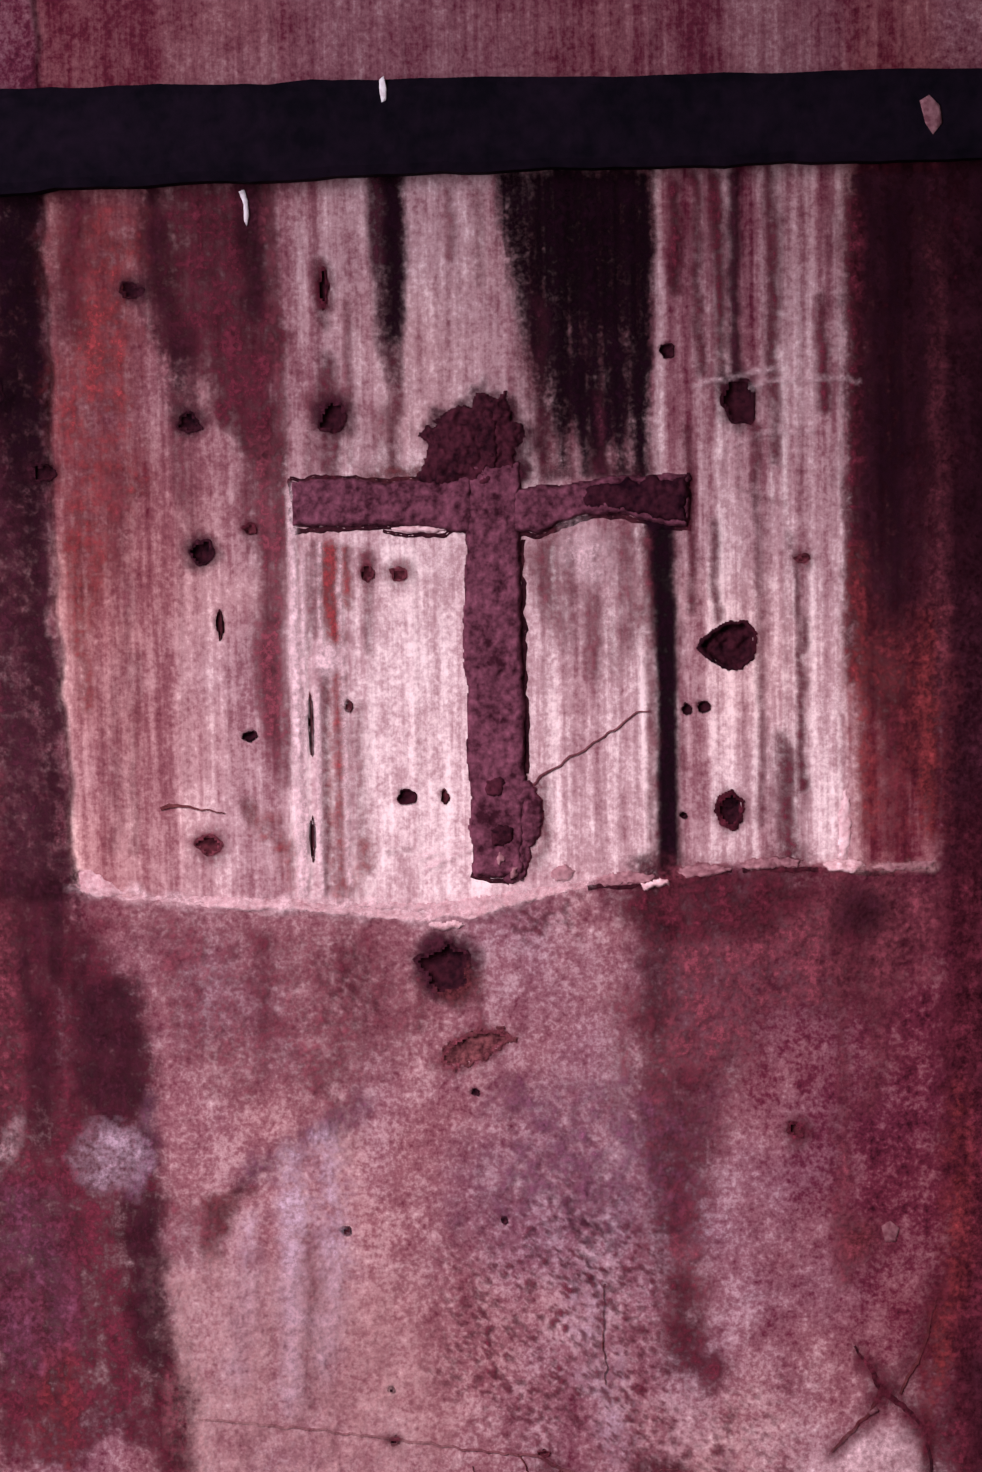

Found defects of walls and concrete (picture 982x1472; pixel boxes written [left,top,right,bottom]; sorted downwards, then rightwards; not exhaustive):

water stain [366,177,418,479]
water stain [424,170,740,481]
corrosion [308,542,369,645]
corrosion [532,535,569,624]
water stain [0,194,199,1472]
corrosion [322,674,346,899]
crack [532,710,650,786]
crack [195,1418,575,1472]
crack [601,1284,609,1384]
crack [831,1301,936,1472]